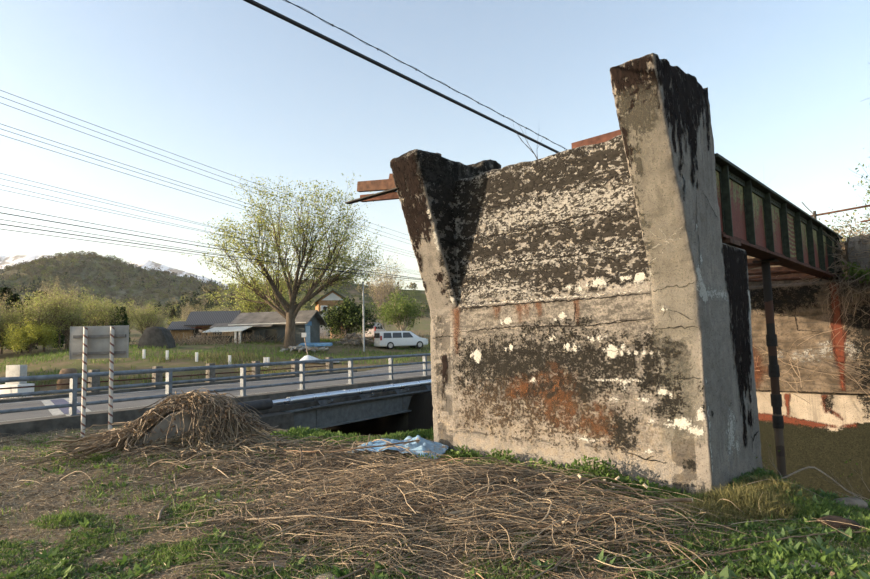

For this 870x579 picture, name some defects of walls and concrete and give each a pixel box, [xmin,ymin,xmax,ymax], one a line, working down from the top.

damp [390,55,710,313]
damp [440,315,689,456]
damp [705,244,870,502]